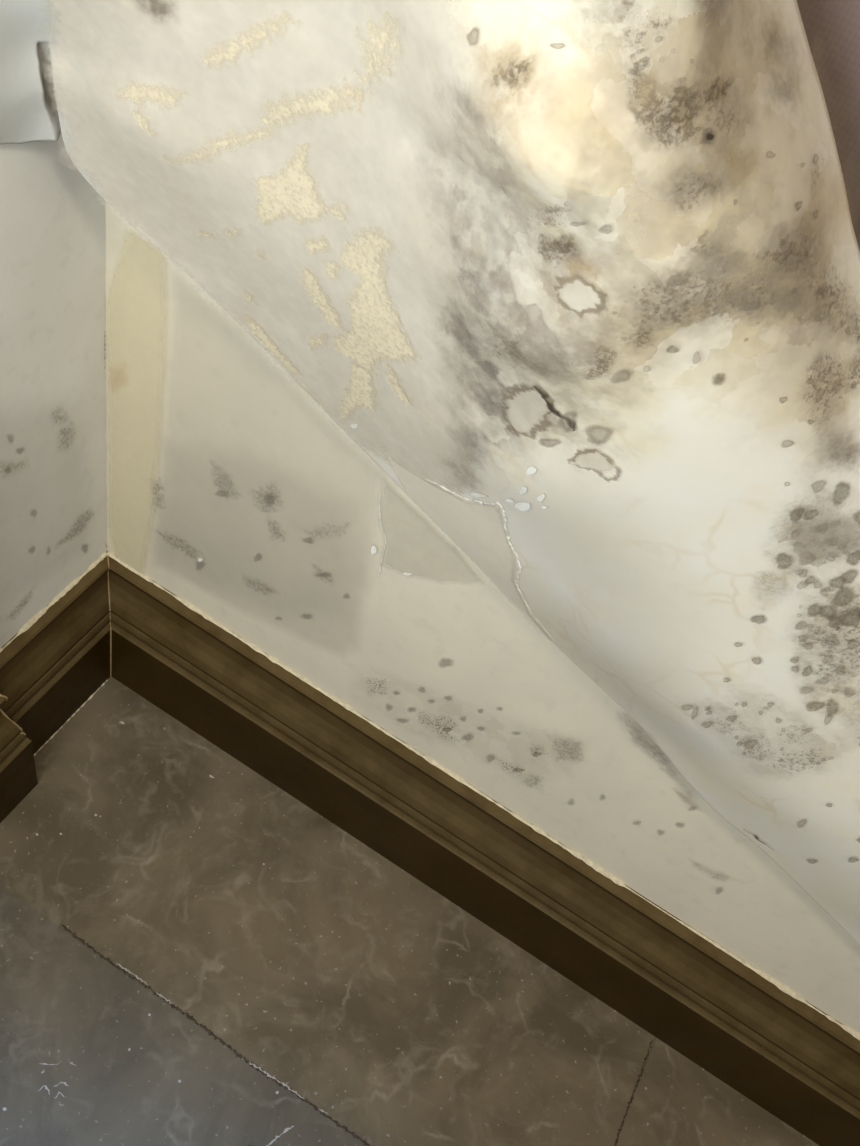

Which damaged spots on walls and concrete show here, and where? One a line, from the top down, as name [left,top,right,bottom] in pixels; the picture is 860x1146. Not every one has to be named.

leakage [630,21,733,144]
leakage [50,0,547,493]
leakage [539,204,585,260]
leakage [622,266,774,372]
leakage [808,358,860,424]
peeling [504,466,547,512]
leakage [812,481,849,504]
leakage [776,508,860,724]